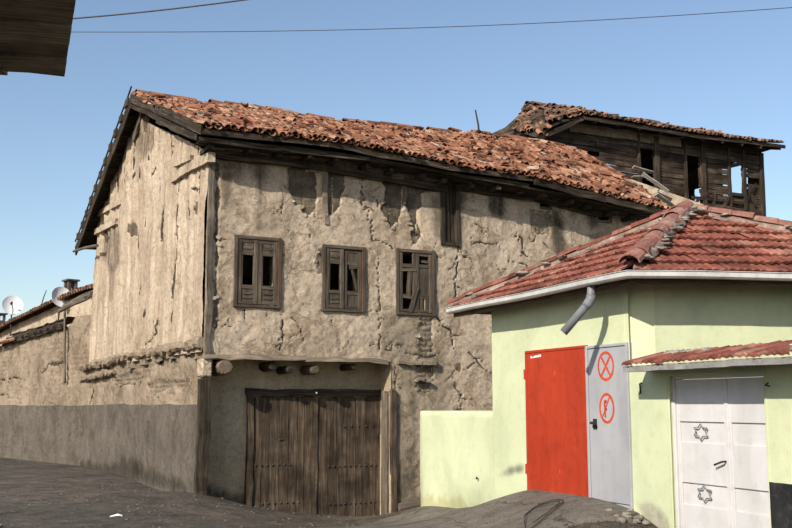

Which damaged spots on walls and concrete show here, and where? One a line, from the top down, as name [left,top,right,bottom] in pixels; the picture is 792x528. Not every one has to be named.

crack [117,138,200,345]
peeling [287,167,317,217]
peeling [326,172,349,215]
peeling [380,181,436,244]
crack [354,185,431,393]
peeling [415,317,436,396]
crack [435,316,487,406]